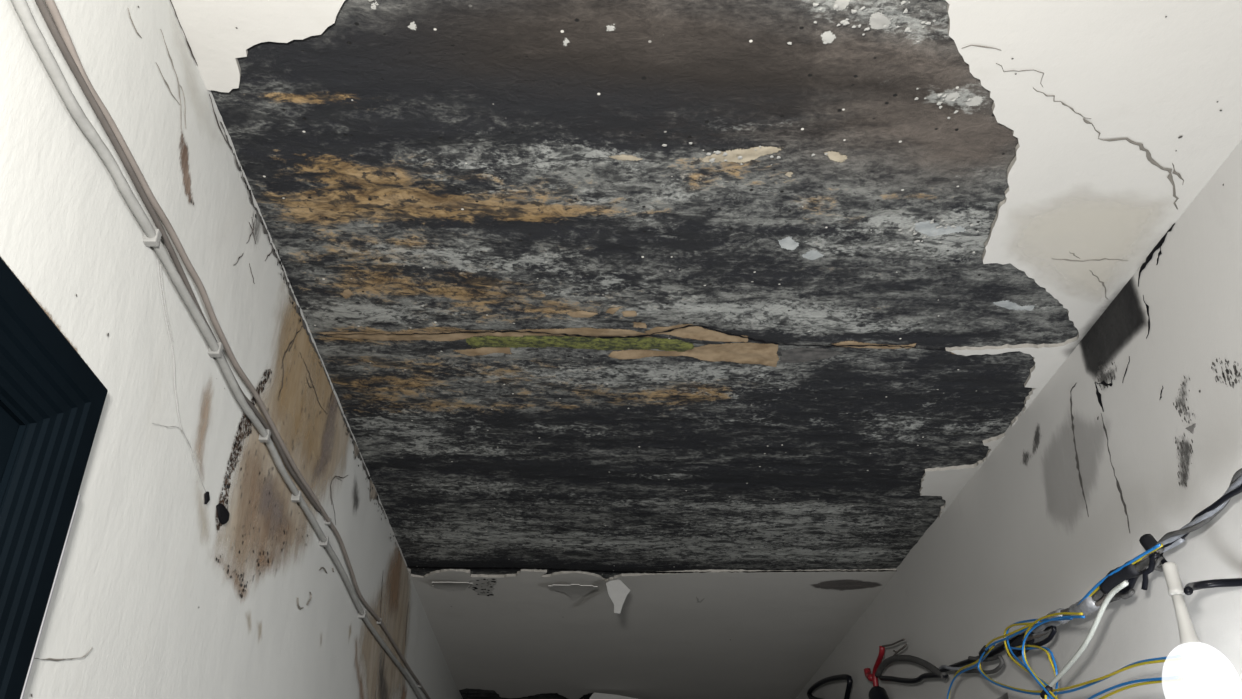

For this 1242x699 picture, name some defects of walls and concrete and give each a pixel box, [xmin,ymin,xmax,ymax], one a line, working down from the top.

crack [963,45,1184,210]
peeling [211,0,1145,596]
damp [198,394,210,458]
damp [204,301,349,598]
damp [349,549,409,699]
peeling [459,688,593,699]